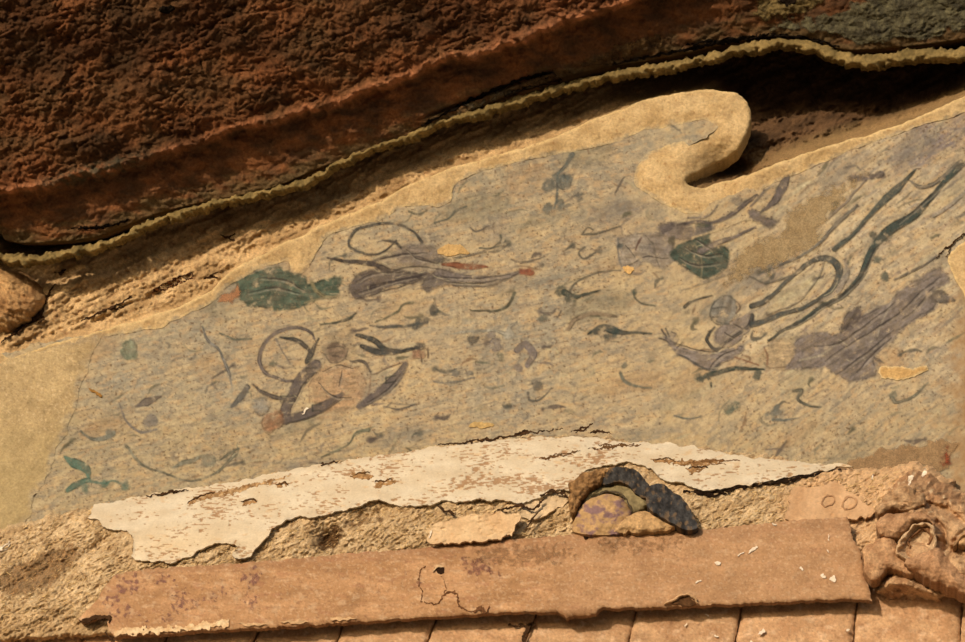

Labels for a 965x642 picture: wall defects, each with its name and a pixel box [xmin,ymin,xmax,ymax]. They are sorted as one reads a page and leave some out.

crack [438,423,641,460]
flaking render [88,435,958,565]
crack [417,566,490,614]
crack [508,622,535,642]